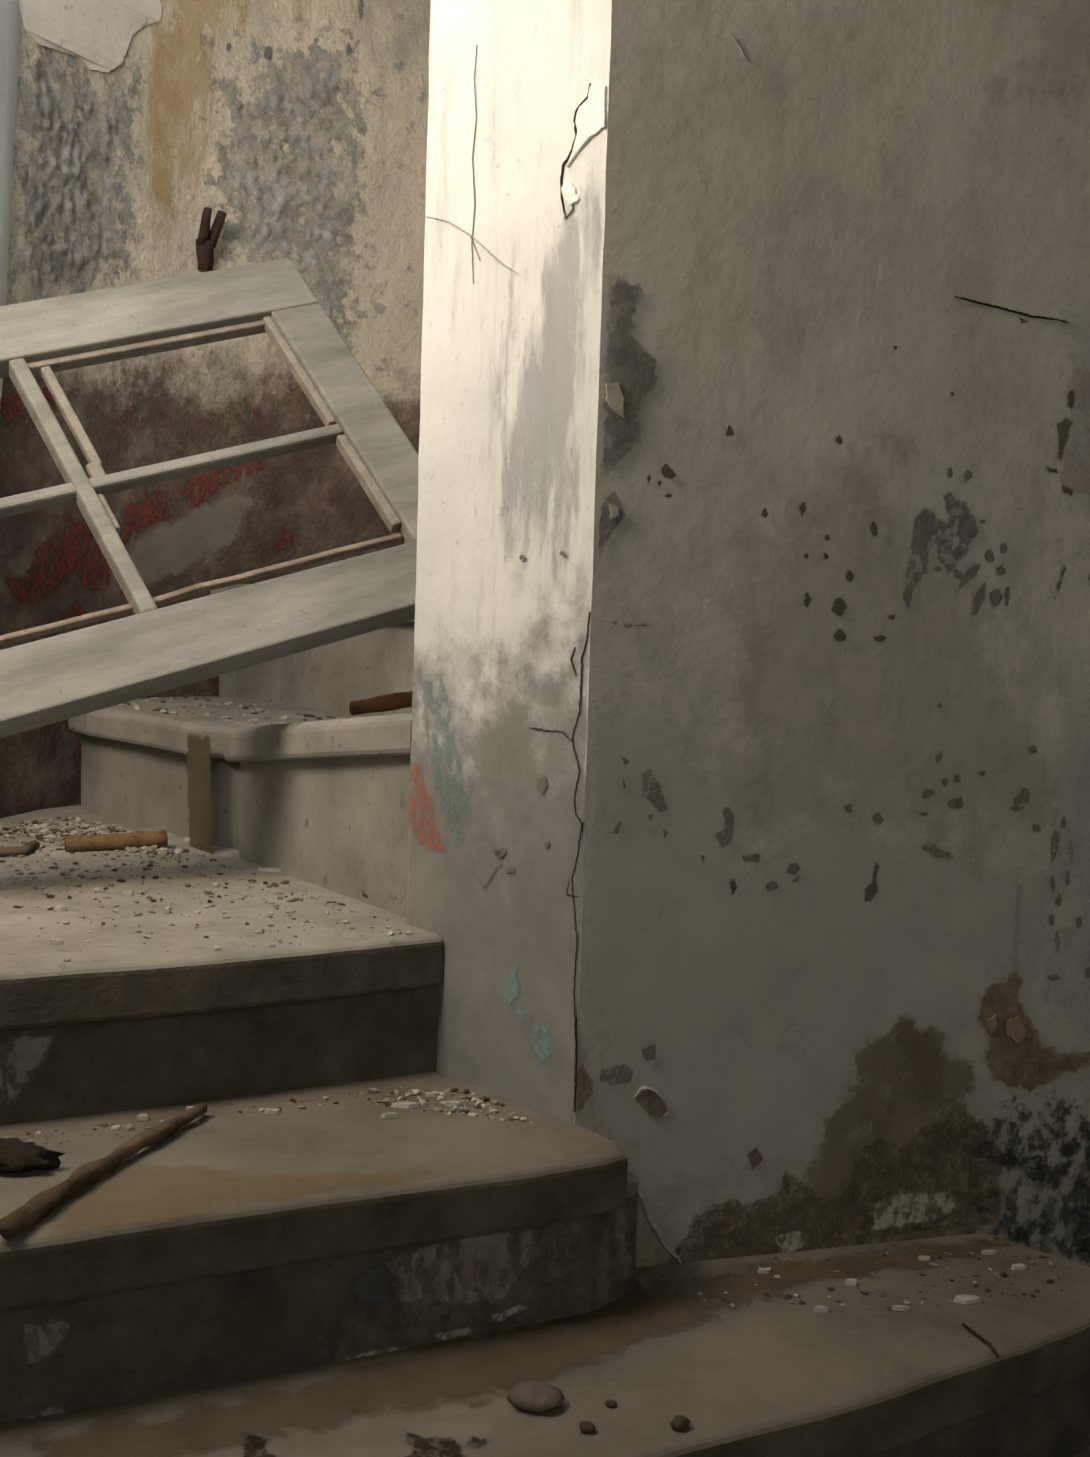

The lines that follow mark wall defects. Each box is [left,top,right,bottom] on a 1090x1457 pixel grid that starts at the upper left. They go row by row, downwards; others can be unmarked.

peeling [19,0,162,73]
peeling [561,86,607,205]
crack [955,296,1069,324]
peeling [602,280,658,468]
peeling [1047,389,1075,495]
spalling [832,570,854,641]
peeling [874,467,1010,641]
crack [530,612,591,1112]
spalling [864,862,879,901]
flaking render [576,1044,669,1122]
flaking render [978,971,1090,1091]
damp [35,1019,1090,1457]